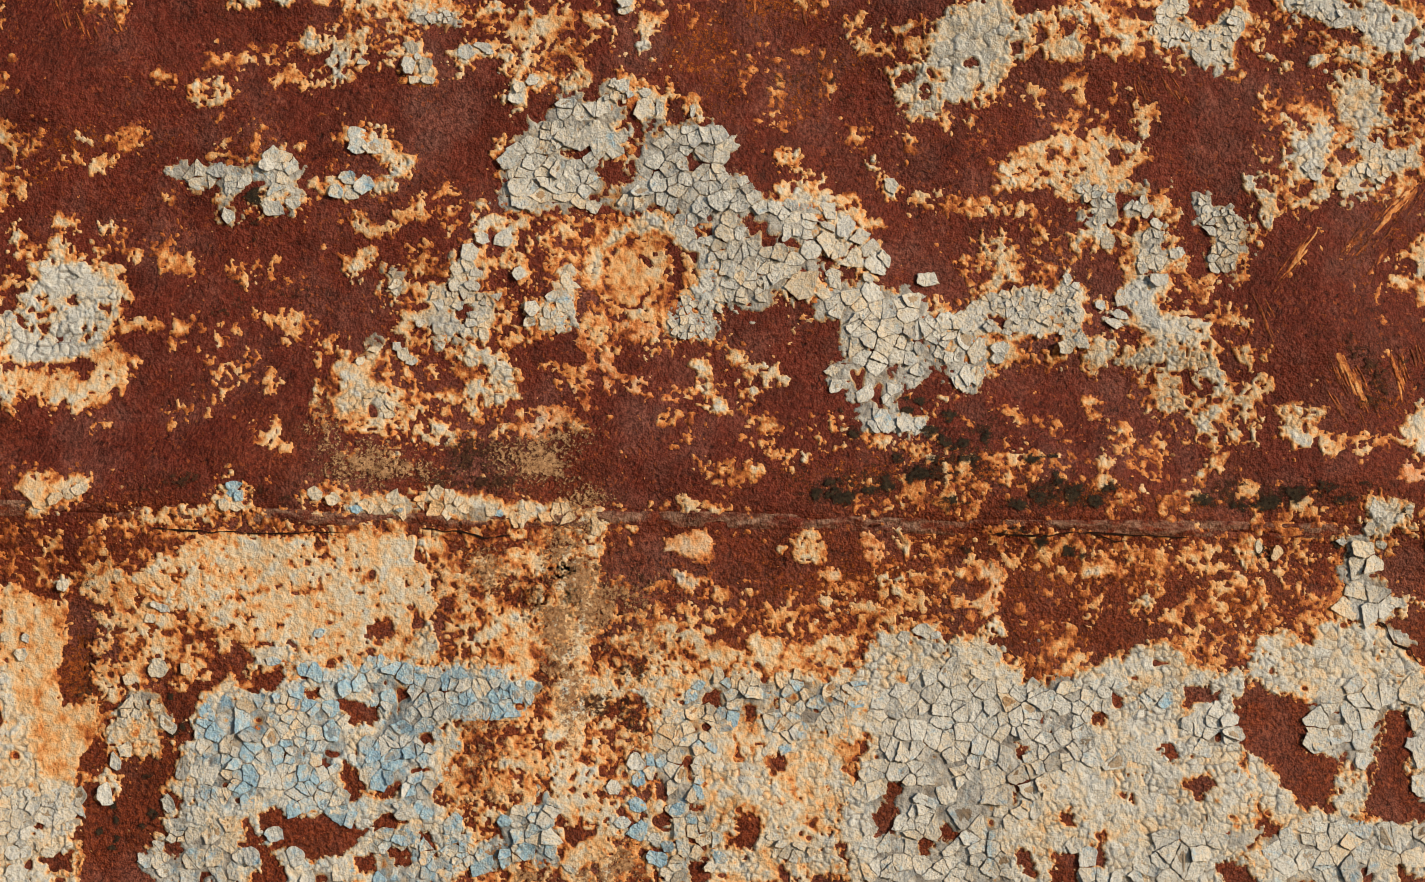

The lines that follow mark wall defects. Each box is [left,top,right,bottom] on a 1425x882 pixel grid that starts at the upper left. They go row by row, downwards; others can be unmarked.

peeling [0,166,170,422]
corrosion [0,71,174,198]
peeling [74,0,133,34]
peeling [147,66,238,108]
corrosion [160,247,340,454]
corrosion [320,176,461,271]
peeling [163,0,1425,520]
corrosion [906,66,1176,227]
corrosion [0,497,254,723]
peeling [0,461,1425,882]
corrosion [416,304,1364,712]
crack [1376,621,1420,665]